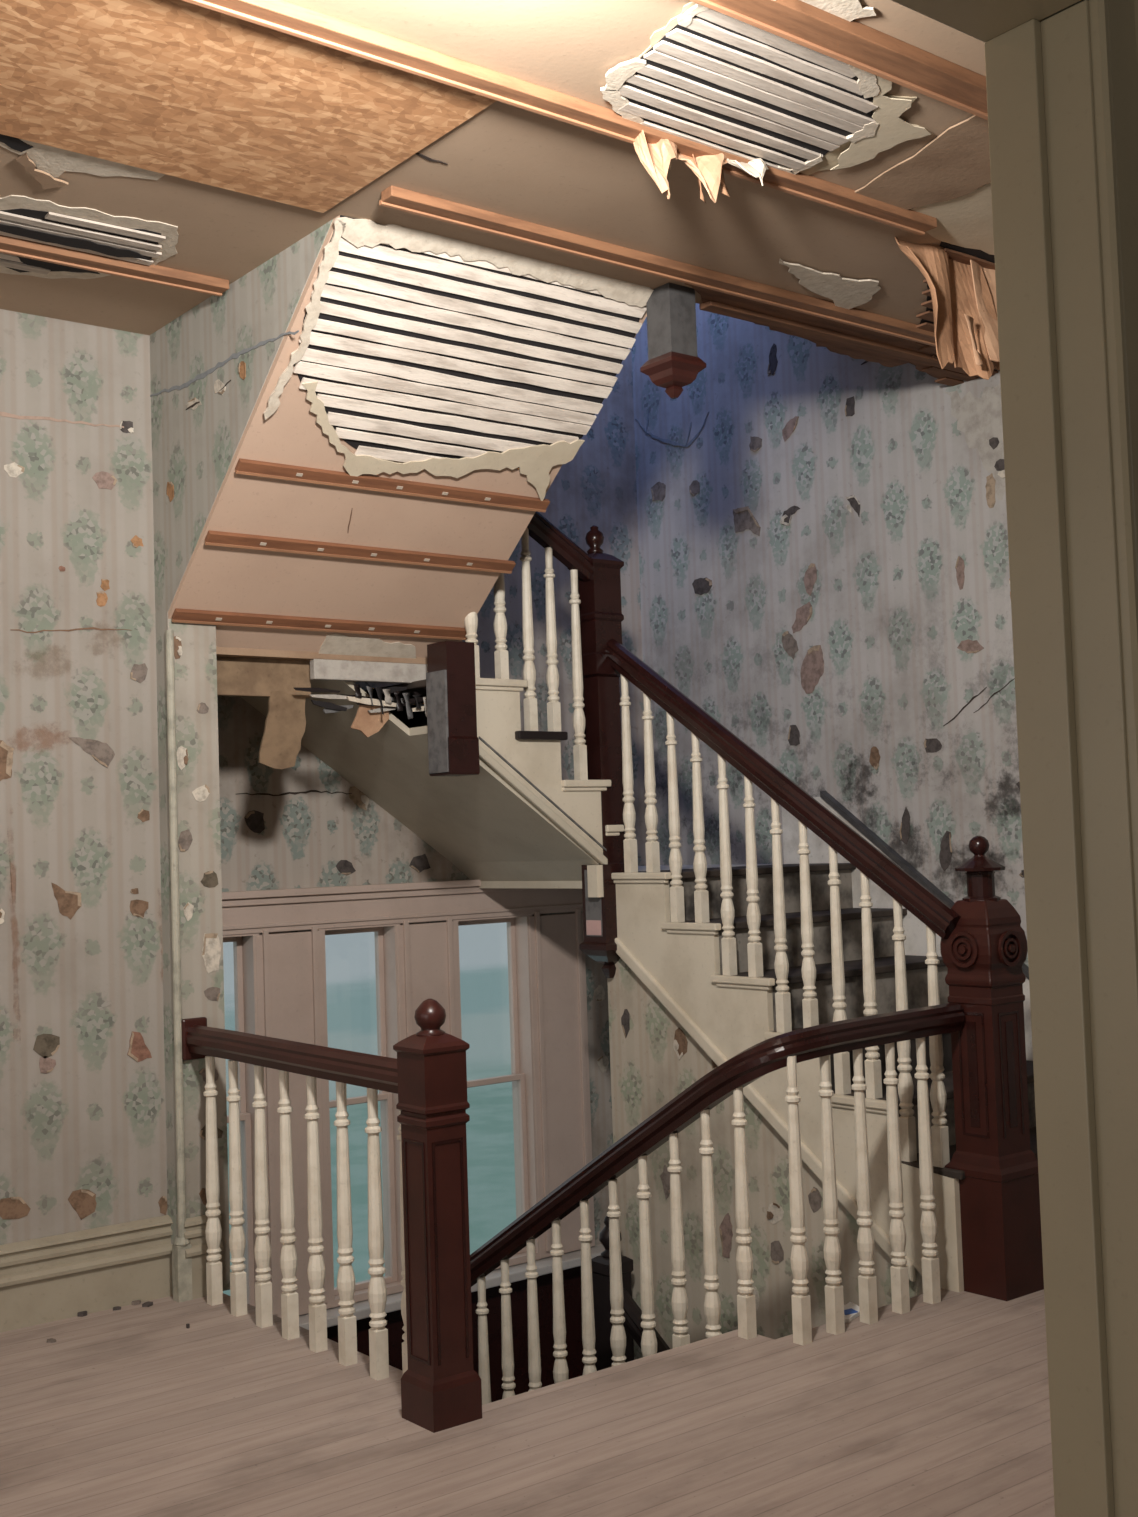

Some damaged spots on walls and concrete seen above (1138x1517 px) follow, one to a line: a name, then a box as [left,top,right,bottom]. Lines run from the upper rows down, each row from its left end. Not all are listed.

peeling [800,0,876,21]
flaking render [0,138,166,180]
peeling [600,4,995,263]
spalling [0,208,162,259]
peeling [779,258,881,309]
spalling [294,235,640,459]
peeling [945,369,1006,504]
damp [986,776,1021,815]